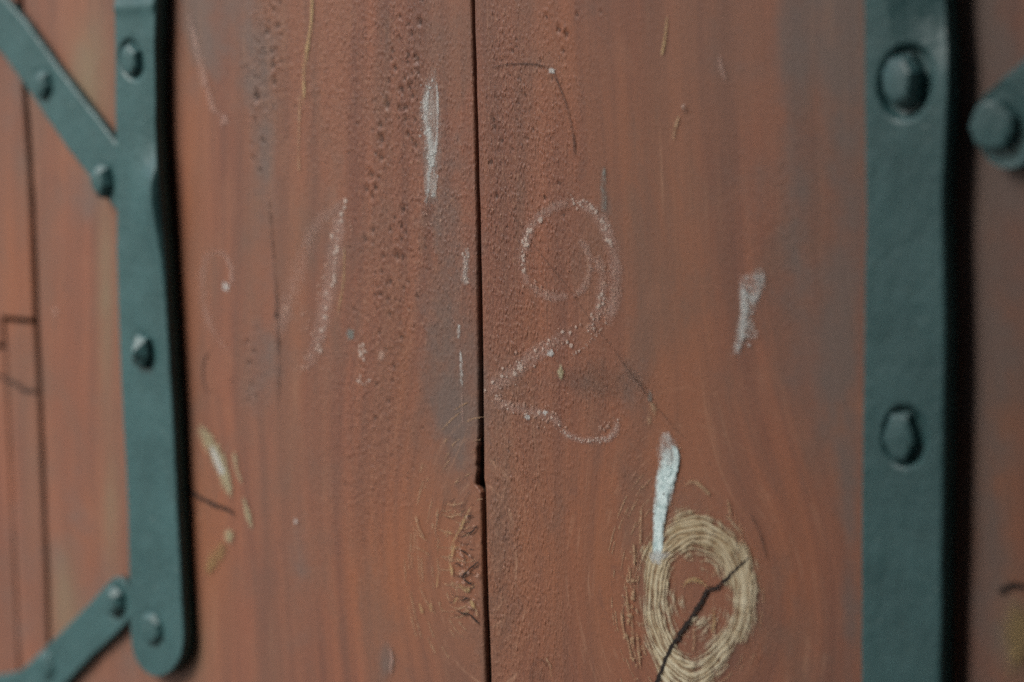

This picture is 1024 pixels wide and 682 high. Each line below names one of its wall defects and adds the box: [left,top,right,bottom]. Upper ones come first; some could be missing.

crack [655,518,766,682]